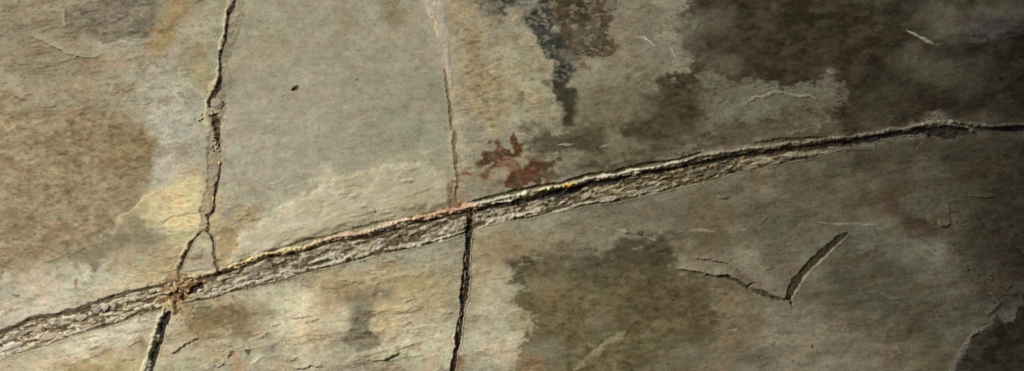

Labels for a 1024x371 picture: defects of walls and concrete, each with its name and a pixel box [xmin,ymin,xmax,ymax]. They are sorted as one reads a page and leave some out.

corrosion [450,131,564,208]
crack [173,0,850,371]
water stain [445,0,1024,371]
crack [0,308,171,371]
water stain [307,223,772,371]